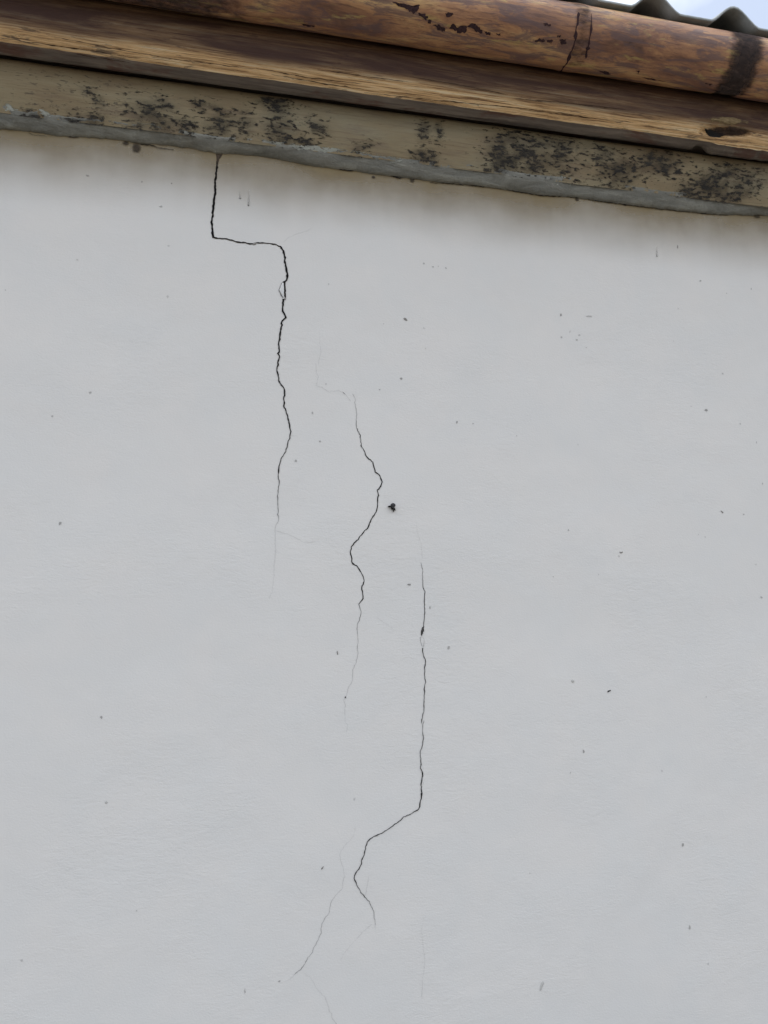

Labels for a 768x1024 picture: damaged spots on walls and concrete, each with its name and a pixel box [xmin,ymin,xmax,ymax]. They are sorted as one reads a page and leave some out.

water stain [0,82,768,231]
crack [210,154,292,515]
crack [350,421,383,621]
crack [354,566,426,911]